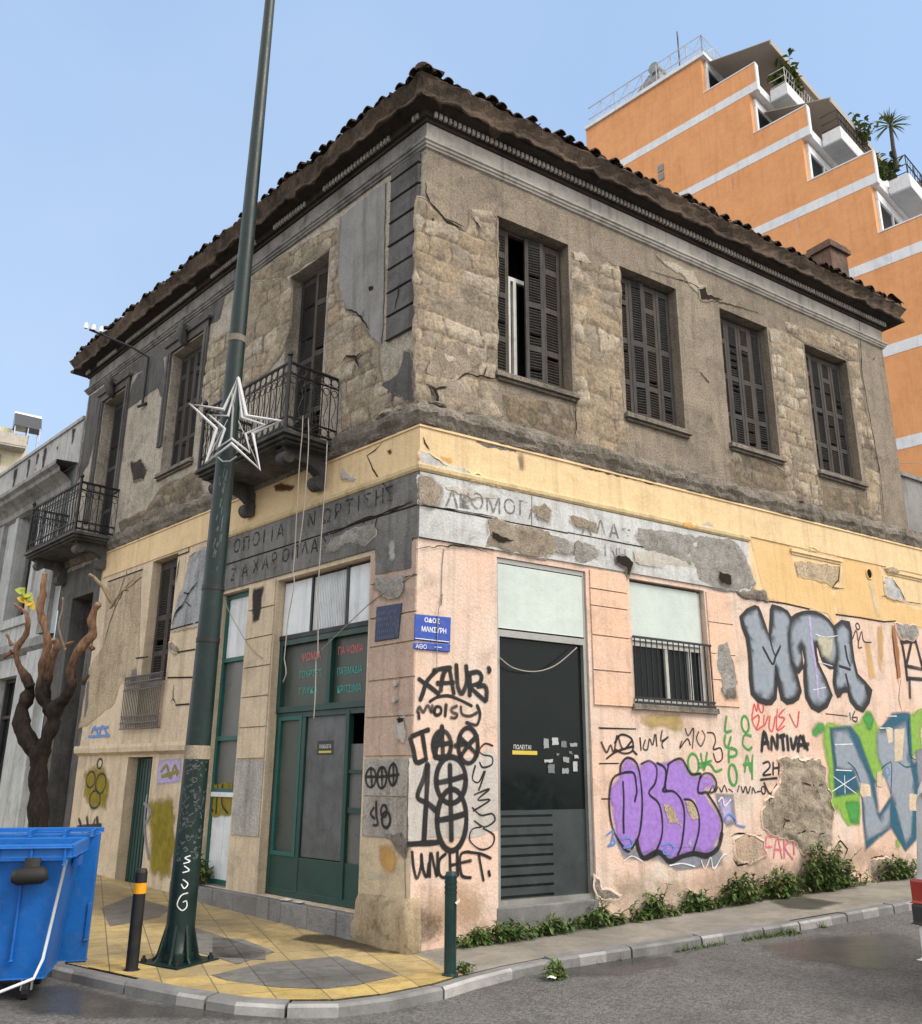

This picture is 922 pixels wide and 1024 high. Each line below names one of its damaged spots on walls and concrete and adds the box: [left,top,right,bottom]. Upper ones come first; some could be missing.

crack [425,182,464,235]
crack [649,270,764,315]
crack [346,309,370,330]
crack [332,441,494,534]
spalling [416,450,600,563]
peeling [168,545,207,654]
spalling [325,522,377,553]
spalling [633,522,769,603]
peeling [794,546,841,587]
peeling [883,565,905,603]
spalling [715,642,737,699]
spalling [732,833,768,865]